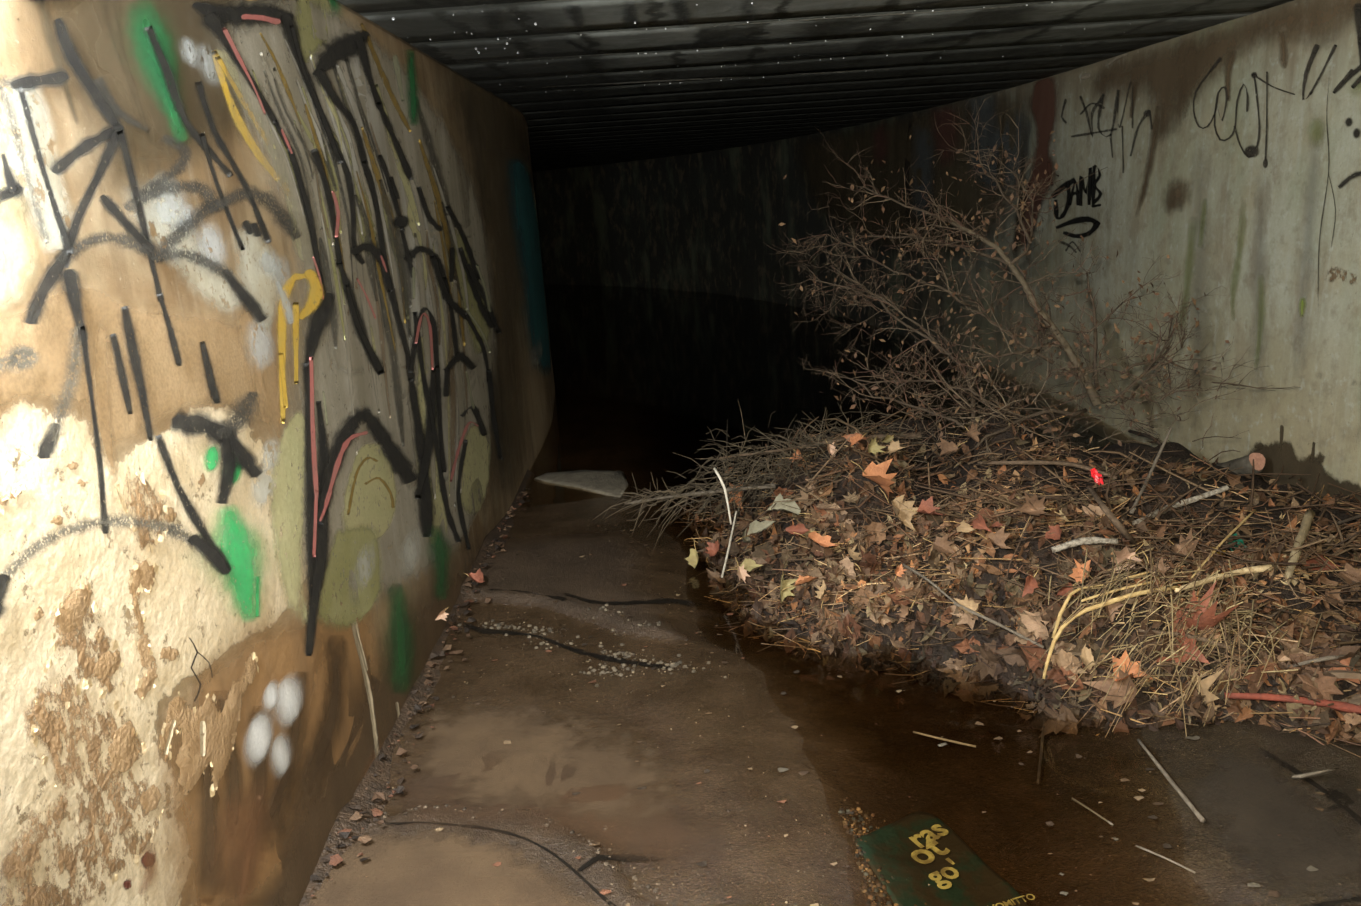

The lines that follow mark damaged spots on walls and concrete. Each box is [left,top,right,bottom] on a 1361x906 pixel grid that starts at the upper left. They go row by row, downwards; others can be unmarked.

peeling [0,453,31,516]
peeling [67,461,88,487]
spalling [0,466,259,906]